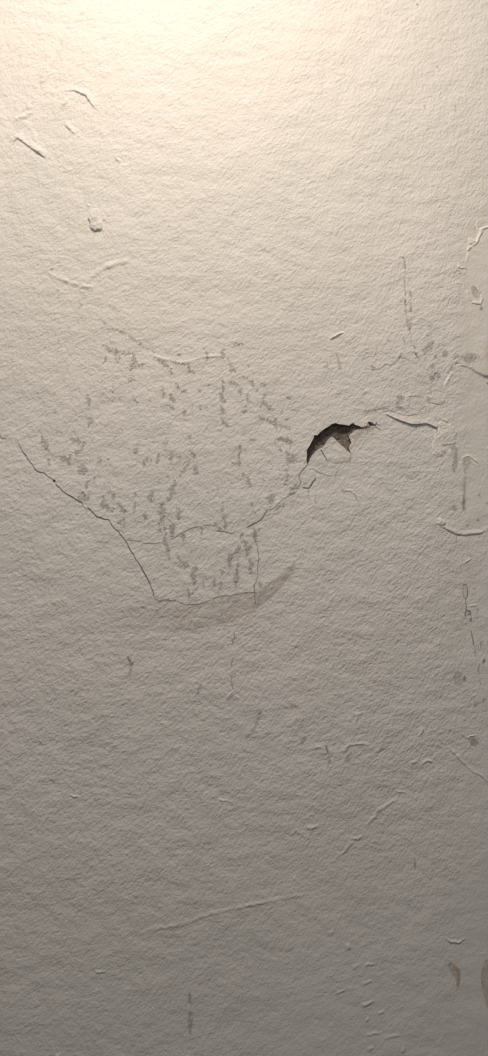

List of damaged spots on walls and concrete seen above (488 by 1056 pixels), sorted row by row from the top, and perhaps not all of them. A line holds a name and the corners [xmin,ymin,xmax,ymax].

peeling [102,328,194,415]
flaking render [205,343,481,510]
crack [0,435,338,605]